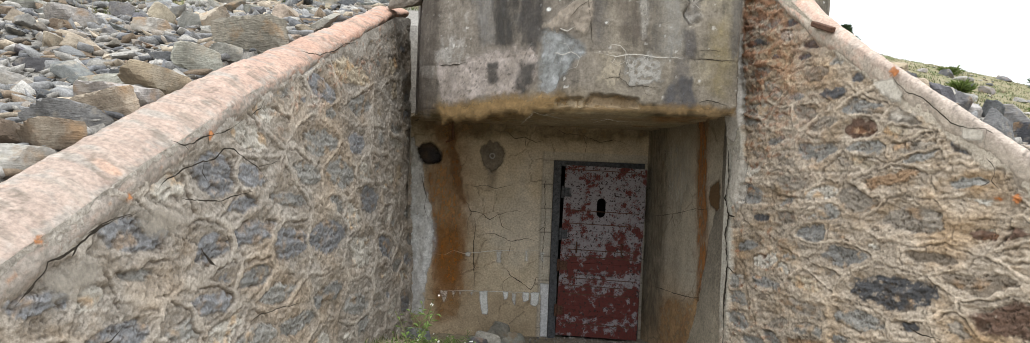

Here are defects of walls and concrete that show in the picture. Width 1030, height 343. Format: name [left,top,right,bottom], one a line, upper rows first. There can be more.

crack [155,104,279,212]
damp [410,138,435,314]
damp [417,0,436,112]
damp [487,62,498,83]
crack [441,181,546,314]
damp [481,0,542,49]
damp [517,64,534,92]
corrosion [427,92,718,320]
damp [539,126,689,328]
crack [894,79,996,186]